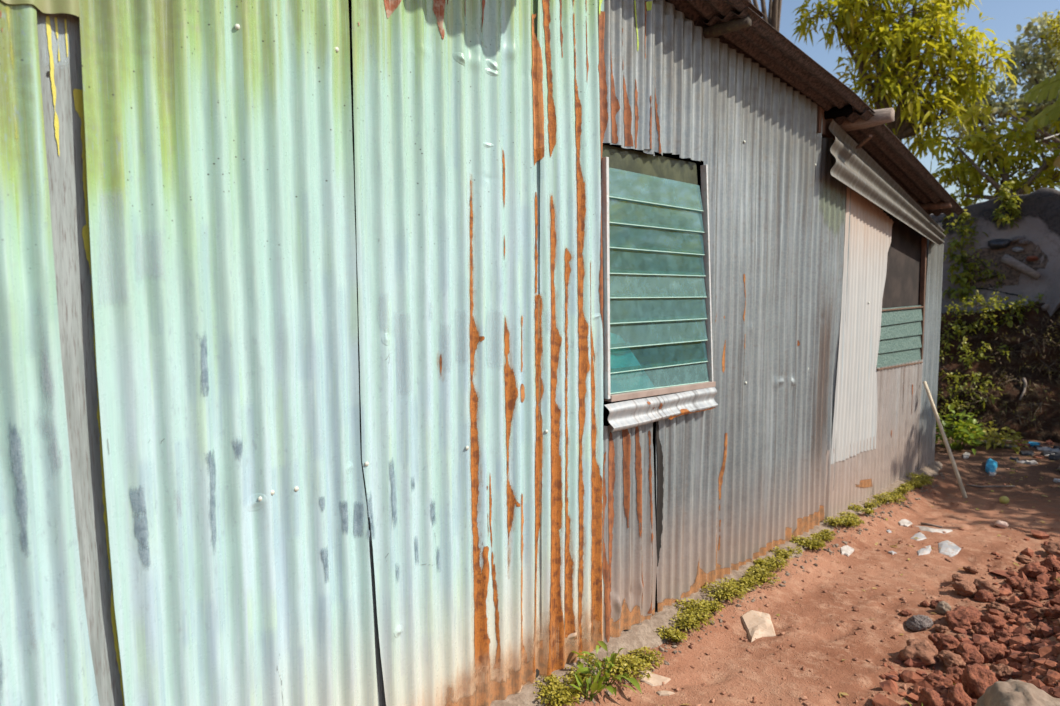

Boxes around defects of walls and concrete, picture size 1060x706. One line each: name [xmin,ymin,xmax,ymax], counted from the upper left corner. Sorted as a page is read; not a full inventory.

corrosion [445,0,824,706]